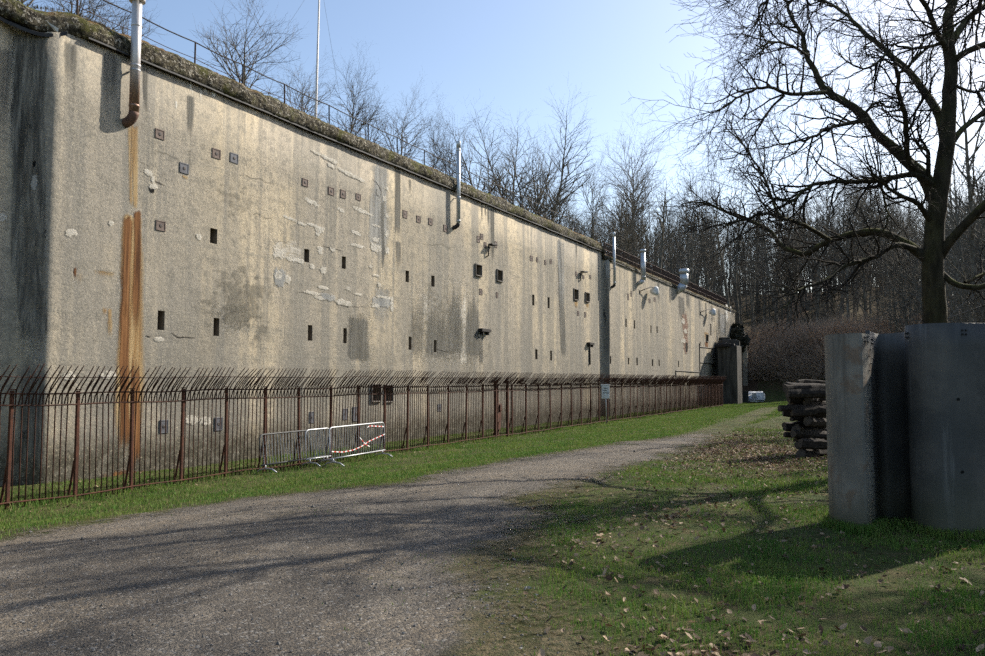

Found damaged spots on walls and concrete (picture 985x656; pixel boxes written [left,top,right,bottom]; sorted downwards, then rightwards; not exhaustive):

damp [0,34,47,337]
corrosion [95,128,143,476]
peeling [273,242,327,287]
peeling [283,215,335,254]
peeling [304,265,393,311]
peeling [337,187,389,254]
damp [20,369,43,458]